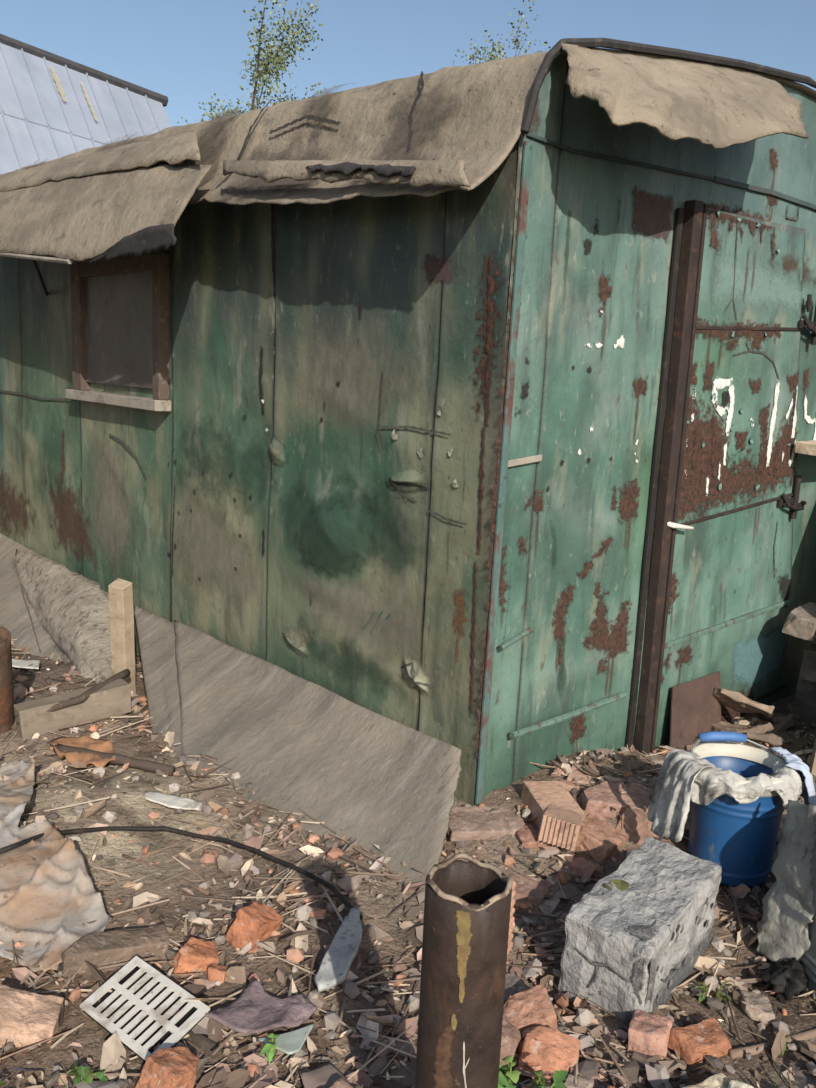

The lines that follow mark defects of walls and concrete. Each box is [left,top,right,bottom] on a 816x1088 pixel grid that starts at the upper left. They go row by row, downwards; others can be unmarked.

rust [632,186,673,240]
rust [705,195,816,283]
rust [633,377,648,397]
rust [678,318,809,523]
rust [0,471,36,536]
rust [50,431,96,567]
rust [453,250,521,759]
rust [525,490,544,531]
rust [612,479,640,546]
rust [552,536,632,694]
rust [661,645,693,684]
rust [570,714,587,745]